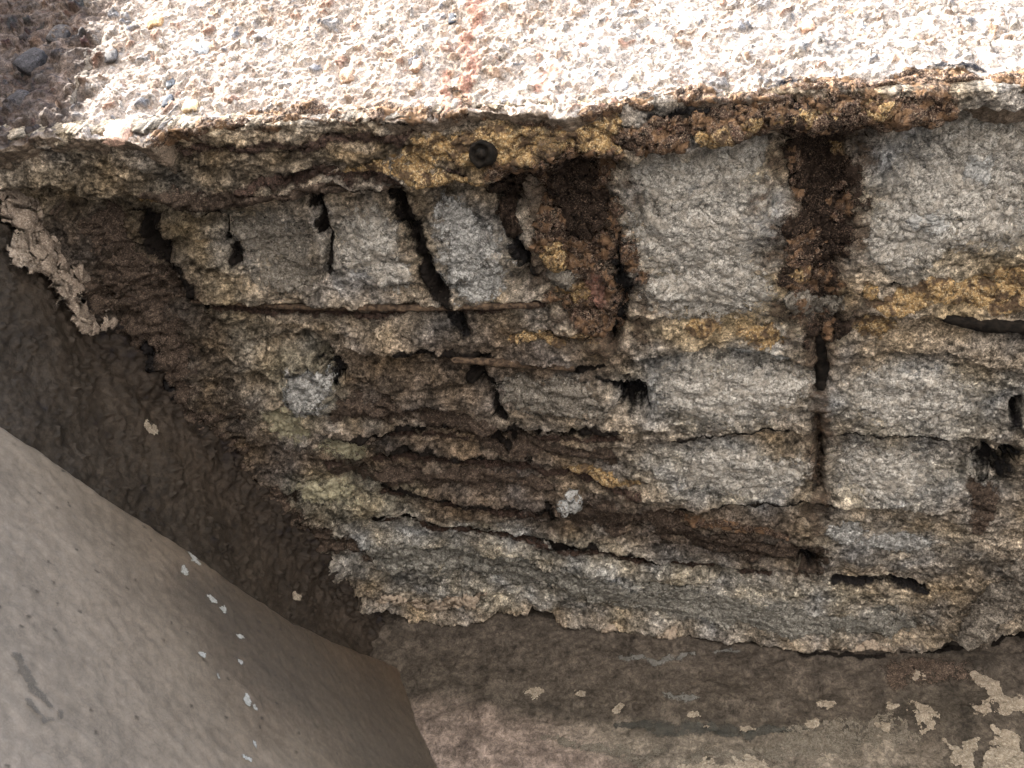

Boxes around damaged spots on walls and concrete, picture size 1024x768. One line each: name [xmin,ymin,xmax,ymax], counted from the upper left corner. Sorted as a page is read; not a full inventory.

flaking render [0,189,118,336]
spalling [336,203,414,294]
spalling [432,190,517,306]
rust [144,0,1024,577]
spalling [621,134,777,324]
spalling [863,112,1024,277]
spalling [495,371,611,425]
spalling [646,357,816,429]
spalling [841,359,986,436]
spalling [673,443,814,502]
spalling [836,442,951,505]
spalling [365,542,936,653]